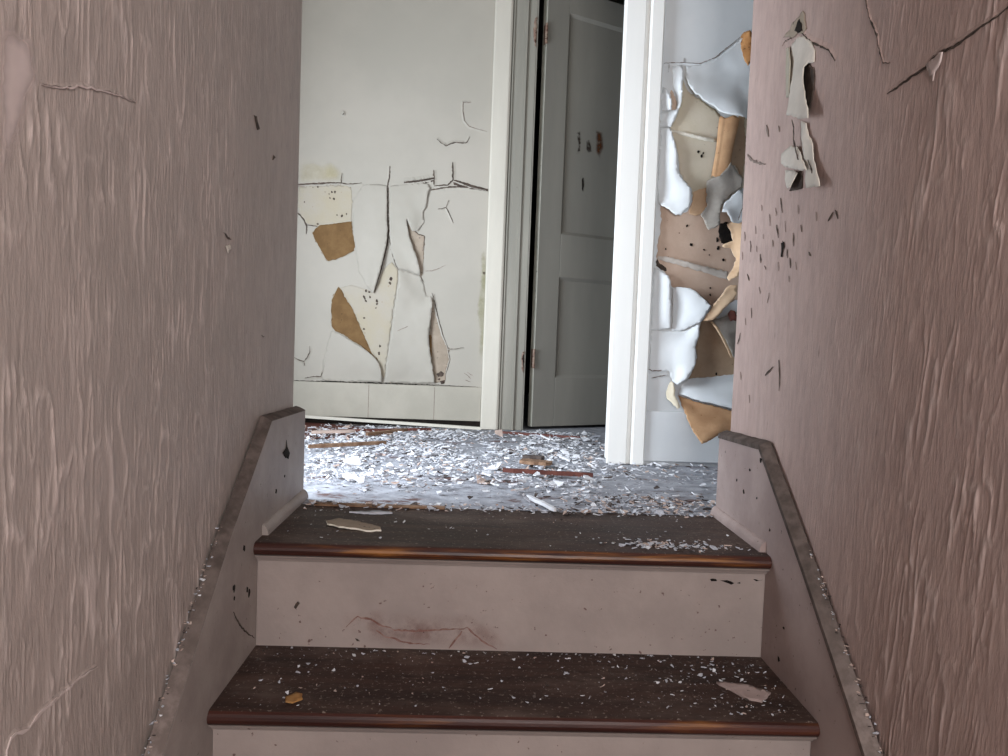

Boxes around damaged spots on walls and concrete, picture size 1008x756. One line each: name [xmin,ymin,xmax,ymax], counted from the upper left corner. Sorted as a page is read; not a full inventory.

peeling [781,11,820,191]
crack [865,0,1008,94]
flaking render [298,185,355,262]
crack [298,100,488,293]
flaking render [407,221,425,282]
flaking render [656,81,745,379]
flaking render [331,262,398,381]
crack [294,266,473,387]
flaking render [429,300,450,384]